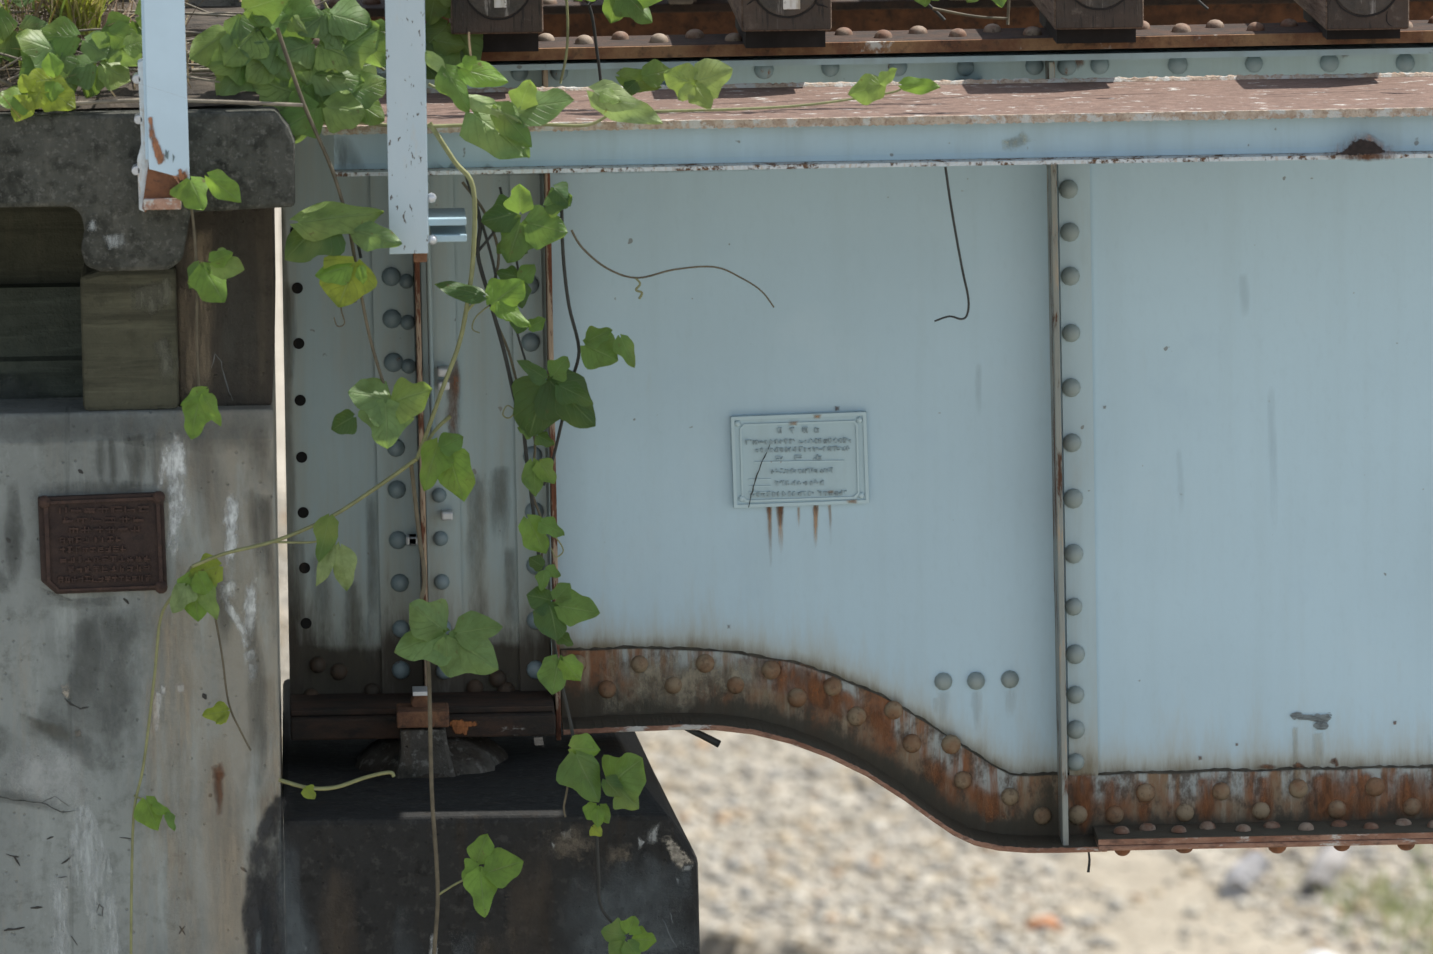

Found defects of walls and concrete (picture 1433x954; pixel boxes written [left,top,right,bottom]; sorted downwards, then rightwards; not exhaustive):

rust [148,117,165,165]
rust [1336,135,1389,161]
leakage [160,442,185,552]
leakage [225,499,237,558]
rust [767,491,832,535]
leakage [221,582,256,678]
leakage [154,685,184,730]
rust [450,719,477,735]
rust [631,665,753,706]
rust [213,765,224,811]